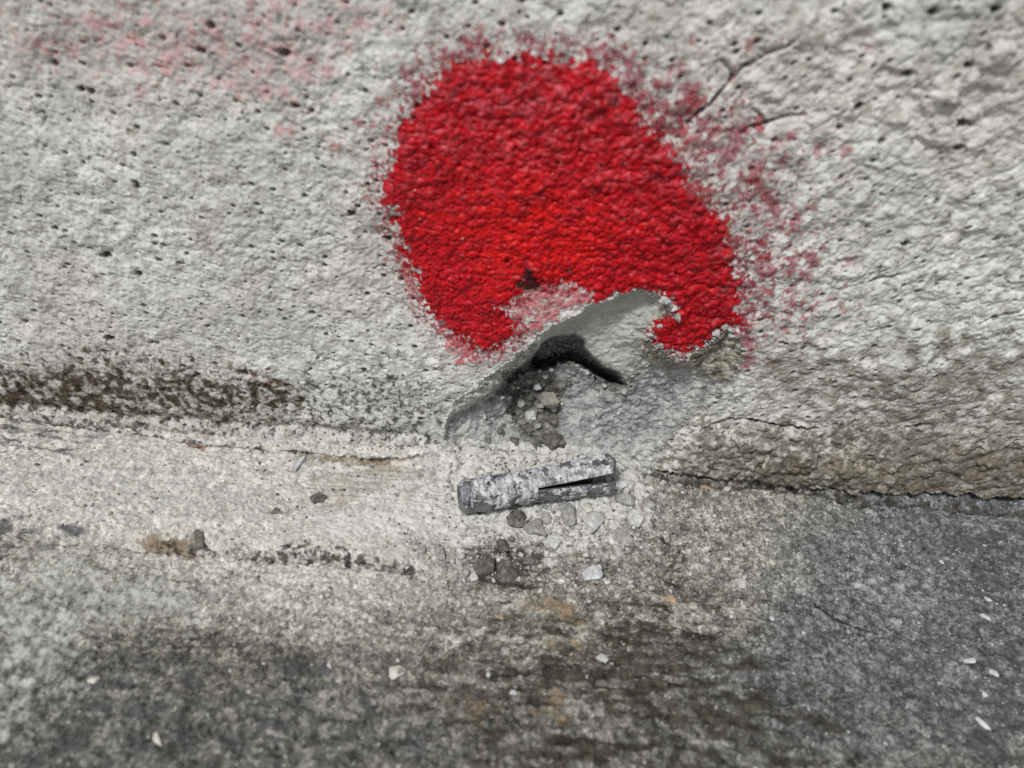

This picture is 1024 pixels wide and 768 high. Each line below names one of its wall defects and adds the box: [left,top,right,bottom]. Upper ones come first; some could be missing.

crack [686,42,792,122]
flaking render [443,289,744,468]
crack [716,418,806,429]
crack [644,461,1024,518]